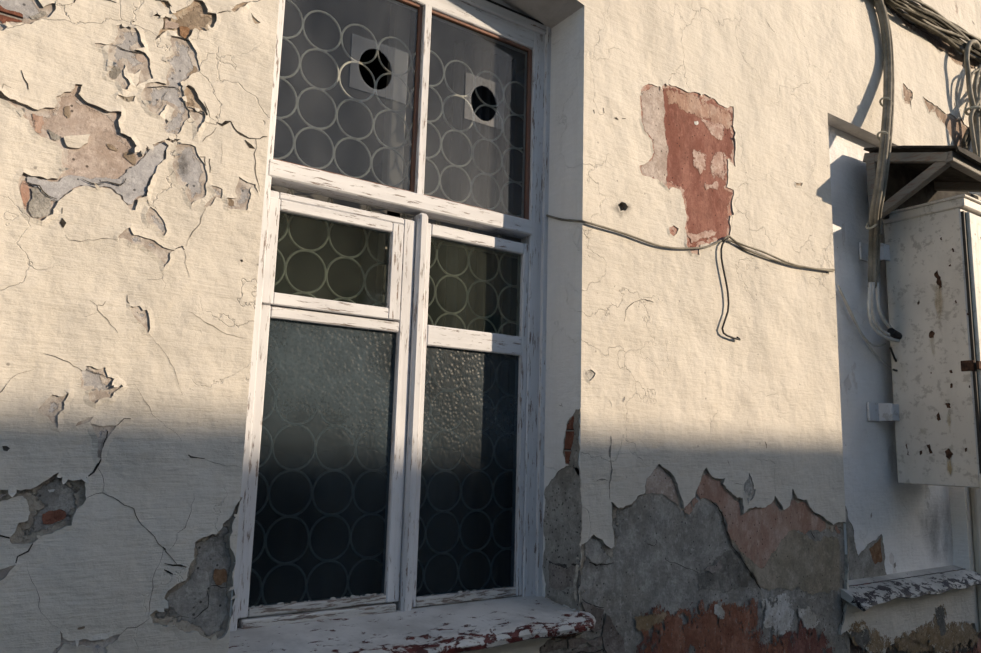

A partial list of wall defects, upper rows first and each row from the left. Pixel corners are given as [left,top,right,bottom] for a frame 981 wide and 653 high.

flaking render [0,0,260,280]
crack [203,103,267,192]
peeling [639,83,753,255]
peeling [38,393,69,428]
peeling [43,353,123,403]
flaking render [0,416,242,653]
crack [164,563,186,575]
flaking render [539,408,981,653]